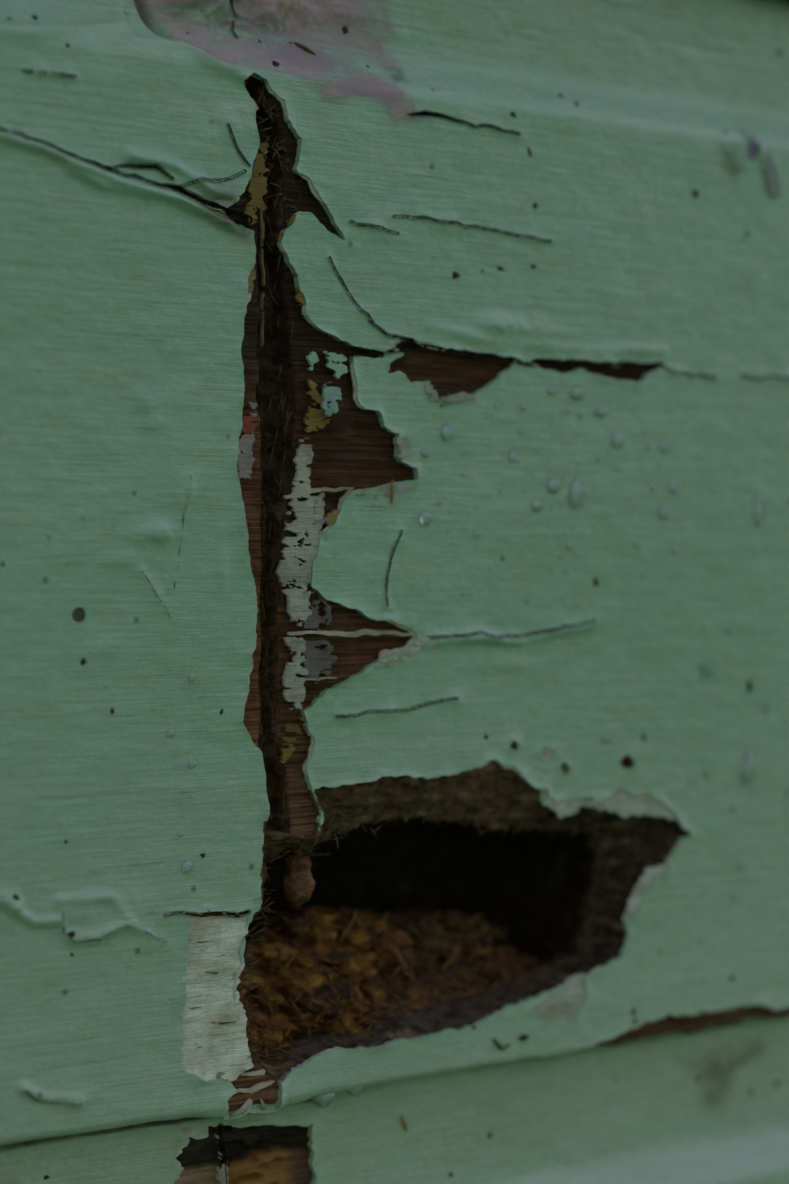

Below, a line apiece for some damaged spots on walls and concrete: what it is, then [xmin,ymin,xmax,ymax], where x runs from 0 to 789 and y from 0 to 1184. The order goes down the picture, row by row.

crack [0,123,253,224]
peeling [205,76,658,843]
peeling [540,788,679,820]
peeling [622,864,668,922]
peeling [174,911,315,1184]
peeling [595,1005,789,1046]
crack [218,1123,227,1184]